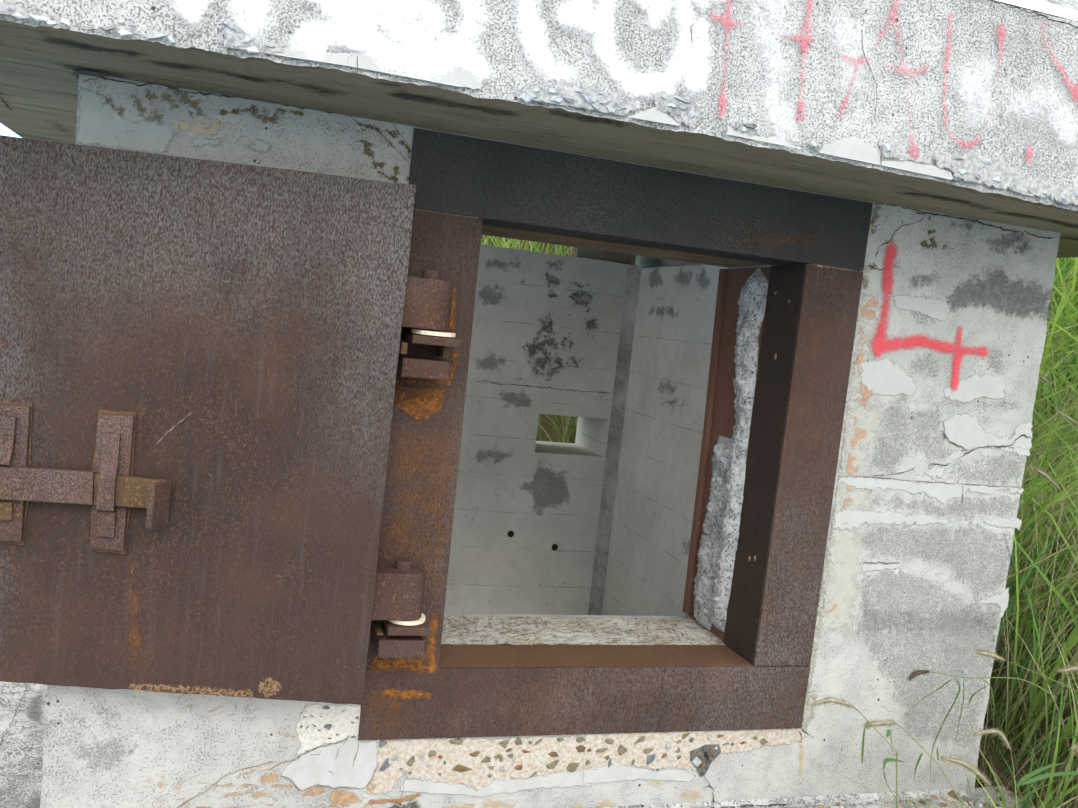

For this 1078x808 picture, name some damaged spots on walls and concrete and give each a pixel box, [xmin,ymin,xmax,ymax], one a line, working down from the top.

spalling [518,83,702,127]
damp [360,129,411,182]
damp [948,270,1050,320]
damp [523,316,580,381]
corrosion [396,352,458,423]
spalling [693,268,769,632]
spalling [367,404,883,795]
corrosion [371,618,438,673]
crack [0,683,28,745]
corrosion [128,677,280,707]
spalling [294,704,361,758]
crack [177,737,374,808]